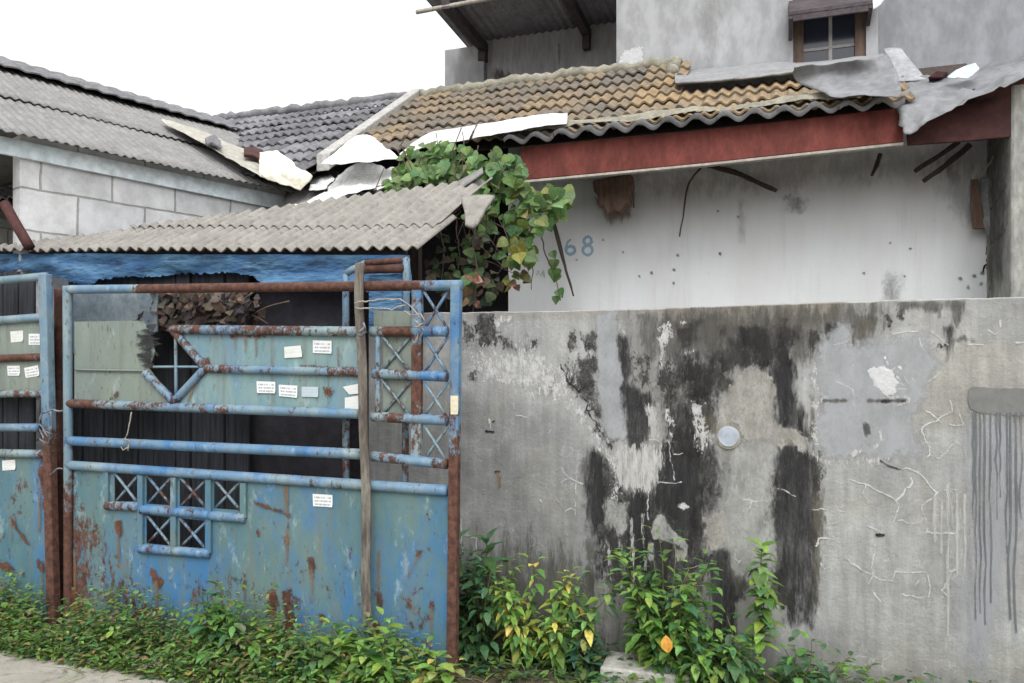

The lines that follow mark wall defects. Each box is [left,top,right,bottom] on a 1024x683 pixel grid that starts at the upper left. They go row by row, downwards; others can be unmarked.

corrosion [114,520,122,564]
corrosion [150,568,163,606]
corrosion [253,485,291,564]
corrosion [267,588,300,637]
corrosion [306,557,316,587]
leakage [459,300,966,647]
spalling [700,365,819,572]
crack [743,400,966,603]
leakage [972,421,1015,656]